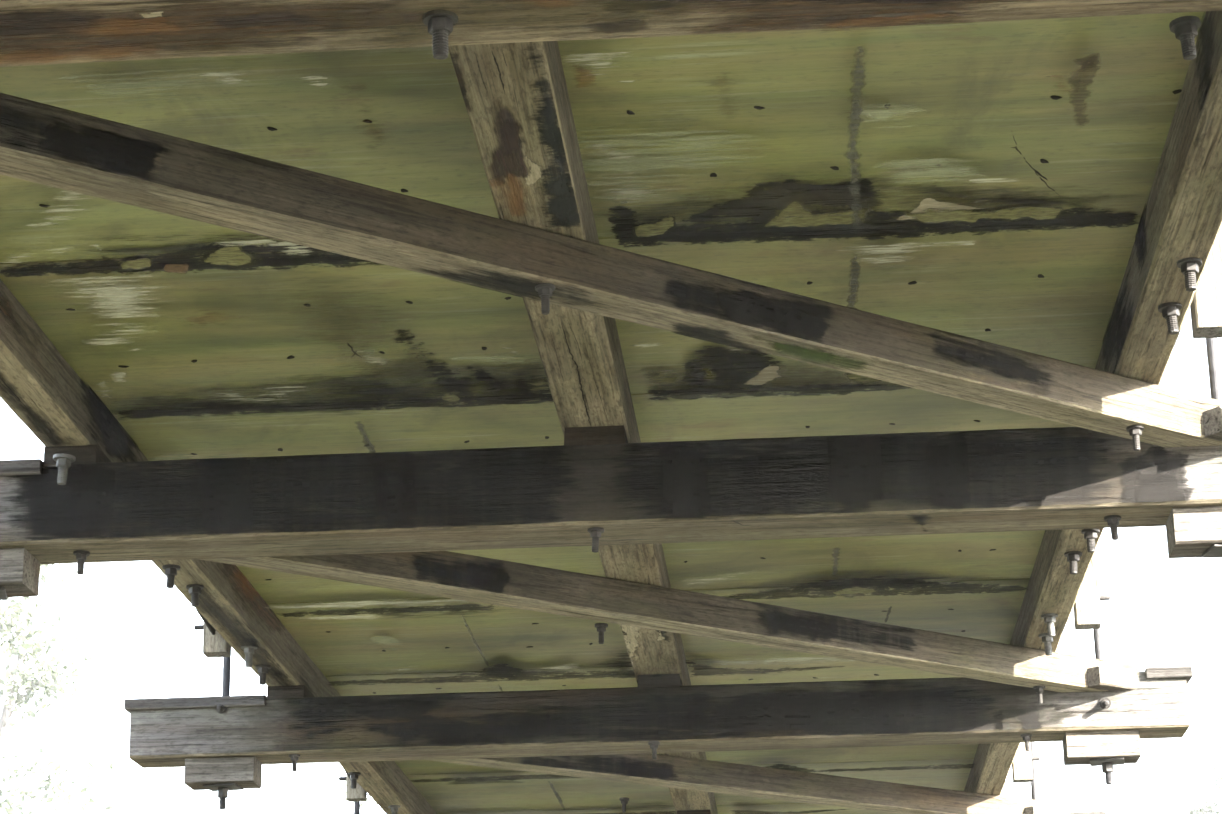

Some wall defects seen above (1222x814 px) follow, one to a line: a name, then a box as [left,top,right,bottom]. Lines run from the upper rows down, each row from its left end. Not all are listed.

damp [450,54,470,111]
damp [531,78,581,227]
damp [3,235,371,277]
damp [608,179,1147,374]
damp [647,280,912,400]
damp [931,333,1051,386]